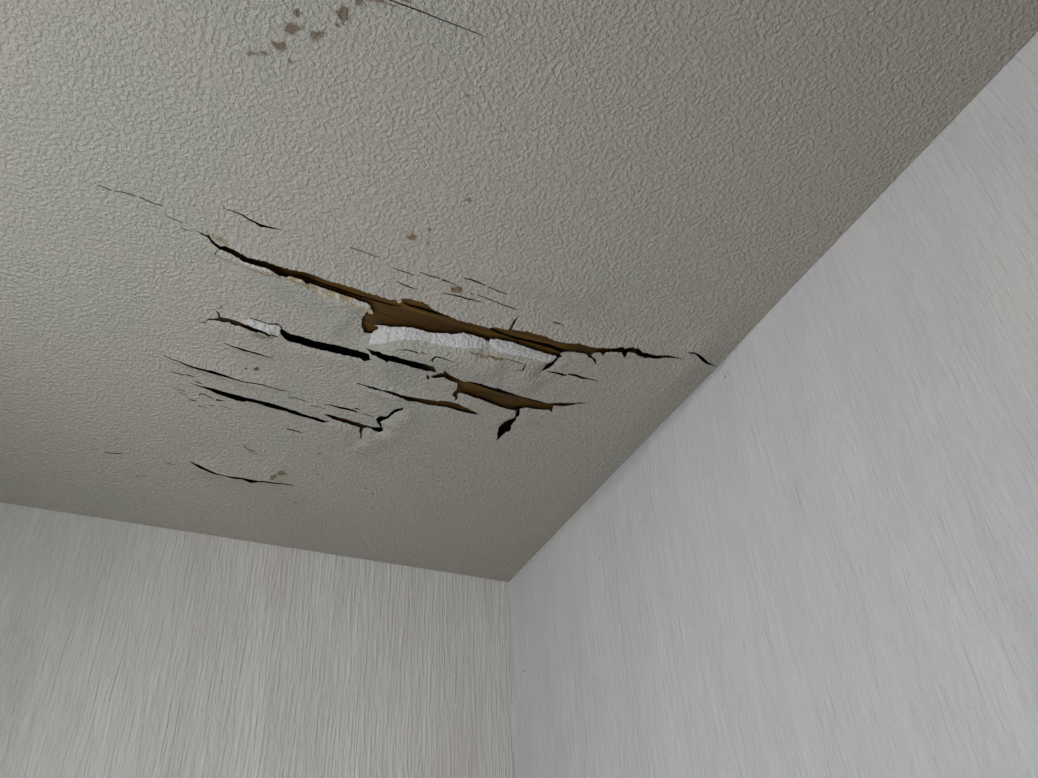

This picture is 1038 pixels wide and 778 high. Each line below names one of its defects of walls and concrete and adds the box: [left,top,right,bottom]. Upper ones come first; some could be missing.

crack [97,184,189,231]
crack [224,208,281,230]
crack [349,247,517,310]
crack [165,306,478,439]
crack [498,339,597,381]
crack [688,351,715,366]
crack [166,461,294,486]